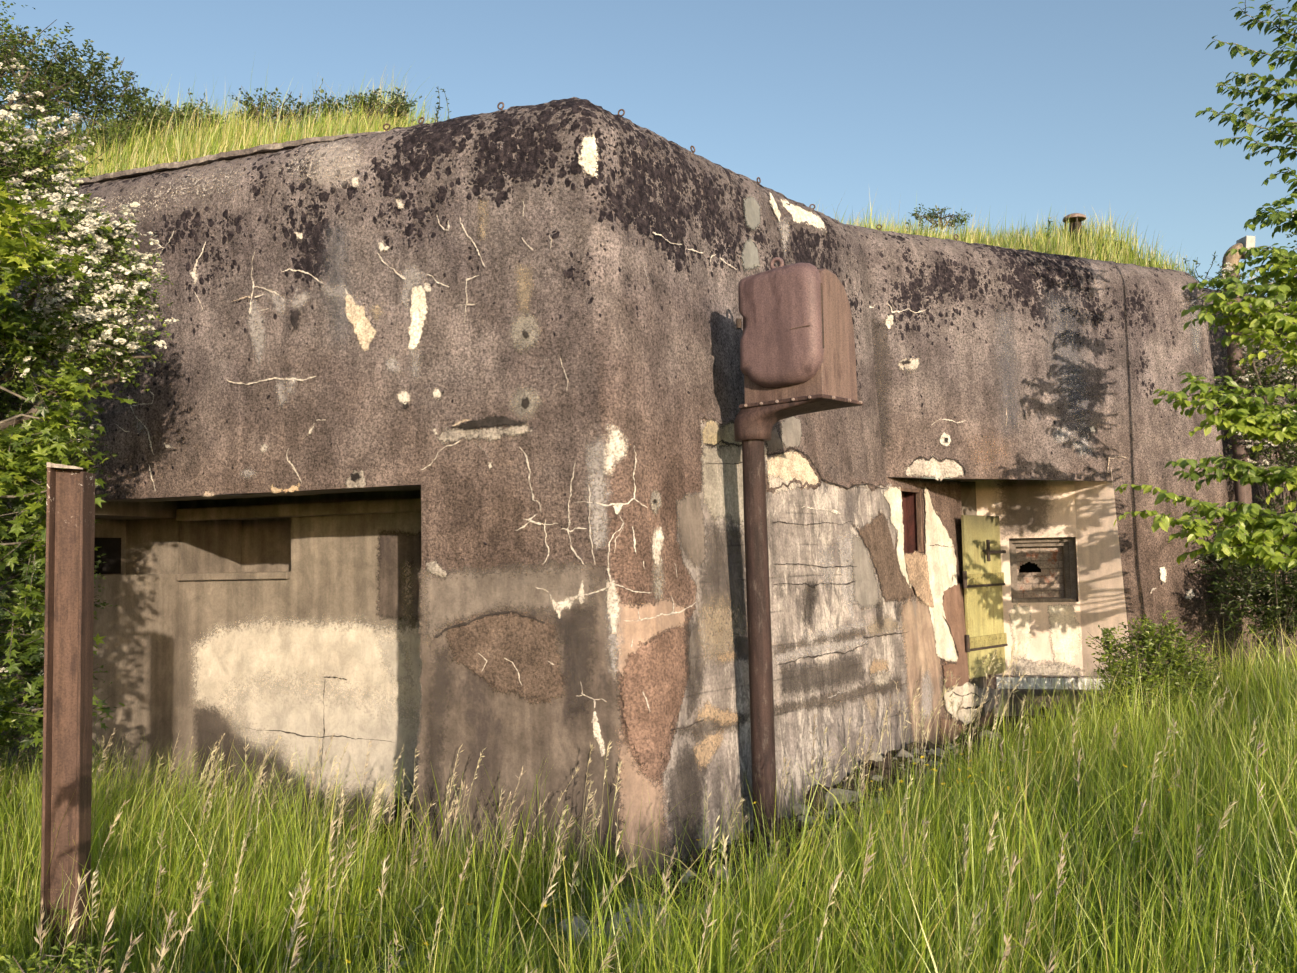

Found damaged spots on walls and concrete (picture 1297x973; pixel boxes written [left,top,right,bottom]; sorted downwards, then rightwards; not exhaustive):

leakage [101,169,244,224]
leakage [280,141,365,187]
spalling [575,135,598,178]
crack [190,242,323,405]
spalling [345,288,380,351]
spalling [402,268,431,376]
crack [421,440,492,470]
crack [518,446,651,618]
peeling [226,412,754,900]
peeling [764,444,994,819]
crack [580,685,606,757]